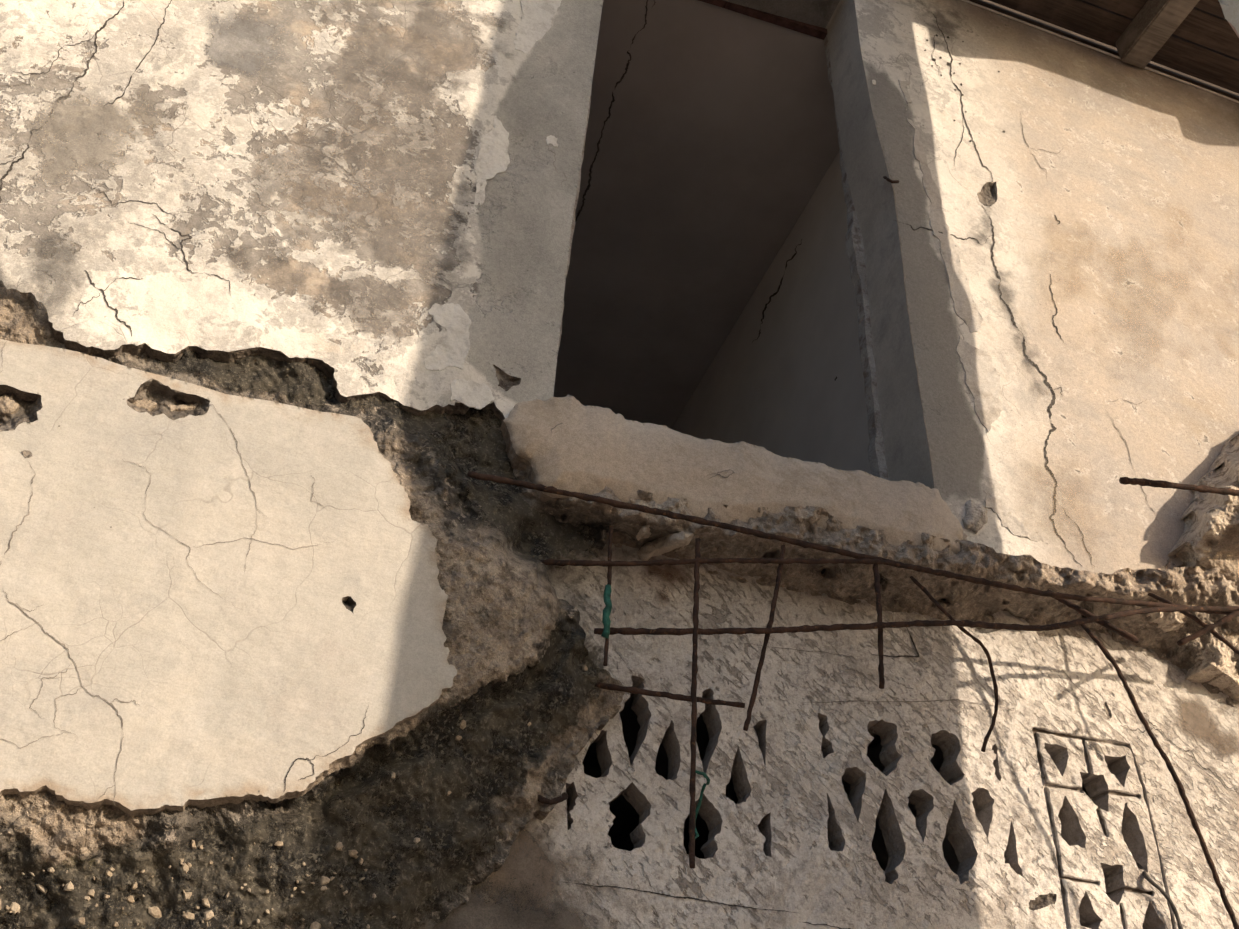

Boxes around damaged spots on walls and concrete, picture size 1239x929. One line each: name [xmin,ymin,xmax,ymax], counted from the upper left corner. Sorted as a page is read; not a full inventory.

water stain [208,16,278,75]
crack [0,0,124,203]
spalling [0,394,43,431]
crack [74,270,142,336]
crack [91,187,231,295]
spalling [127,379,210,420]
peeling [424,303,520,410]
peeling [898,79,1003,432]
crack [874,13,1095,568]
crack [0,461,139,804]
spalling [342,597,356,613]
spalling [467,471,1239,929]